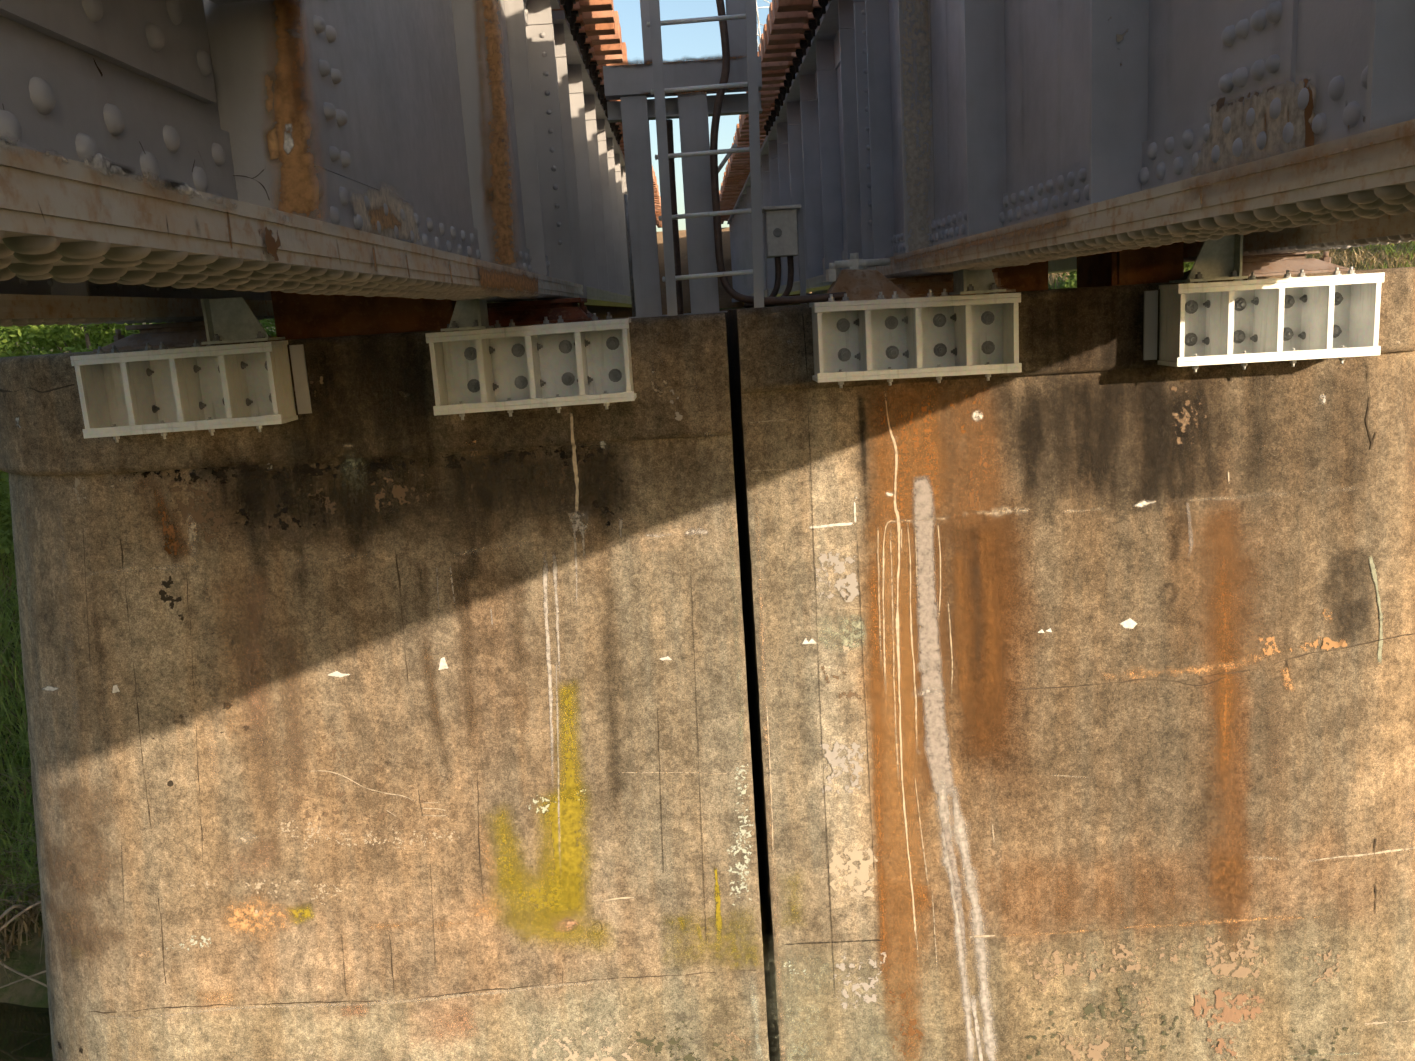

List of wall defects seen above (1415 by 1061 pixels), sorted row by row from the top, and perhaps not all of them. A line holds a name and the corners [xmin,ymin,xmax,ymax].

corrosion [259,227,281,261]
corrosion [265,0,322,218]
corrosion [477,0,538,293]
corrosion [154,489,186,559]
leakage [248,600,448,830]
leakage [123,343,624,598]
leakage [543,555,560,823]
corrosion [871,389,1013,1058]
leakage [1021,296,1230,549]
corrosion [1252,637,1348,660]
leakage [1332,551,1383,662]